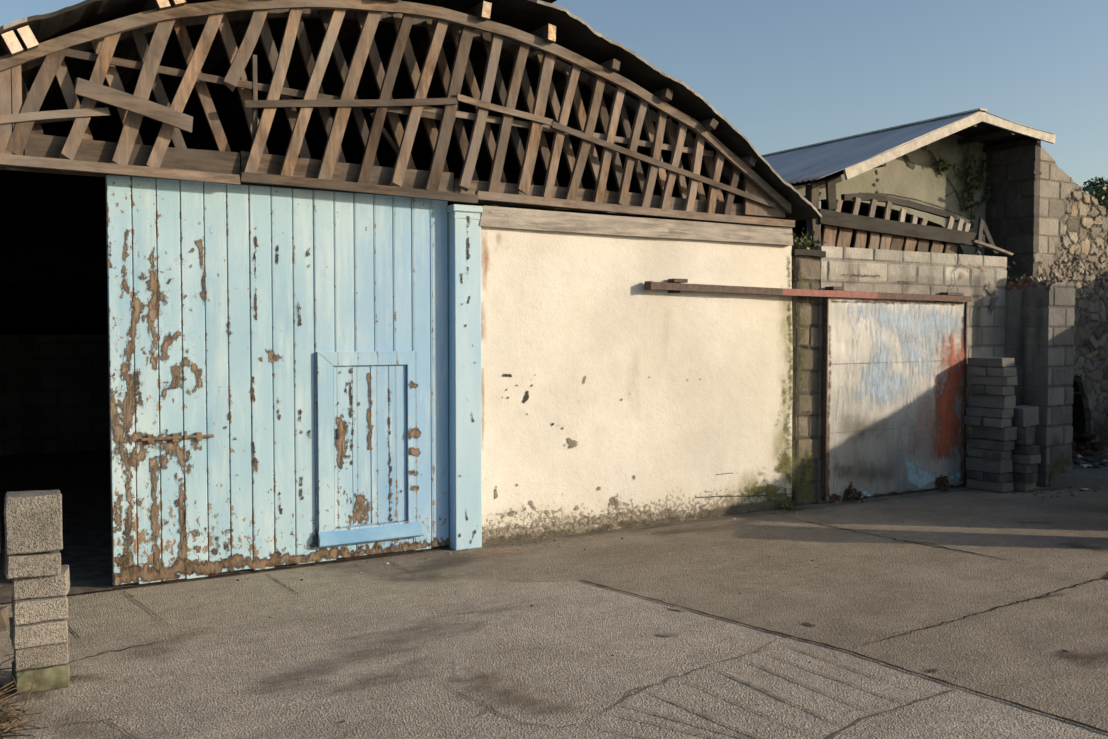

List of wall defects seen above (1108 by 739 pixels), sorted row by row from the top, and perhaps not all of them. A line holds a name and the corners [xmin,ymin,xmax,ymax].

peeling [108,229,234,572]
peeling [334,487,373,526]
peeling [334,368,374,472]
peeling [387,388,419,521]
peeling [408,428,422,457]
damp [482,438,802,546]
rust [832,300,964,481]
crack [69,641,162,663]
crack [855,577,1106,649]
crack [450,689,577,728]